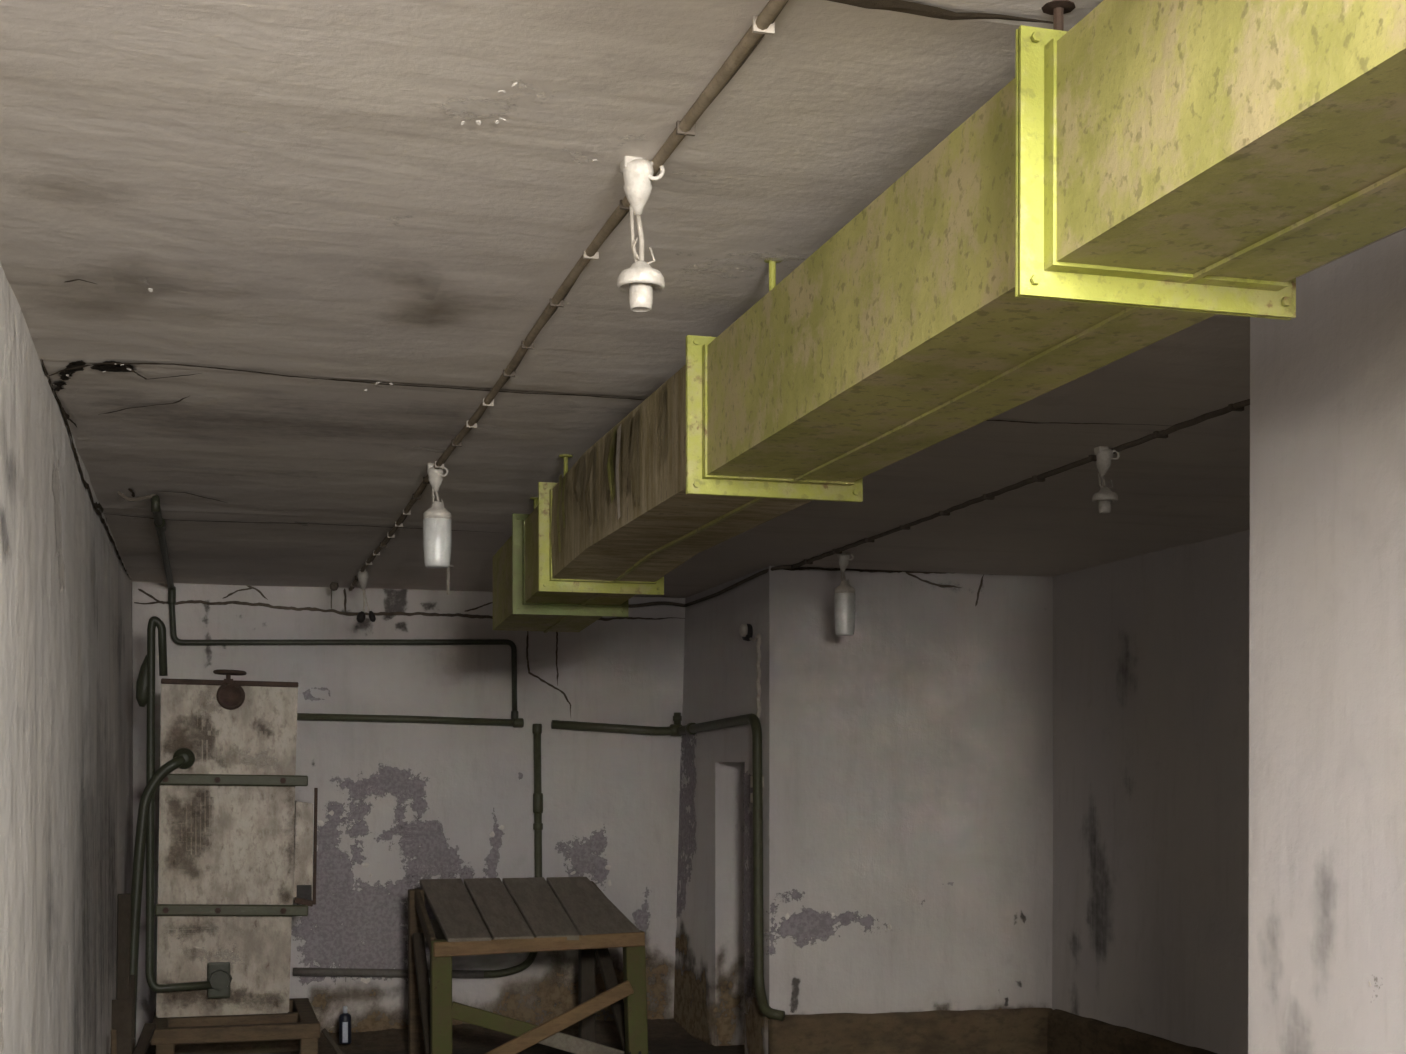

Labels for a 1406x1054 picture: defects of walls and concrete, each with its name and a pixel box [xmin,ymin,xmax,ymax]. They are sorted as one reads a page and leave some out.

crack [827,0,1053,24]
crack [986,419,1168,427]
crack [42,360,643,619]
crack [598,615,685,623]
crack [526,631,571,716]
peeling [291,763,505,985]
peeling [555,827,612,886]
peeling [632,887,651,932]
peeling [676,734,697,917]
peeling [742,771,892,1001]